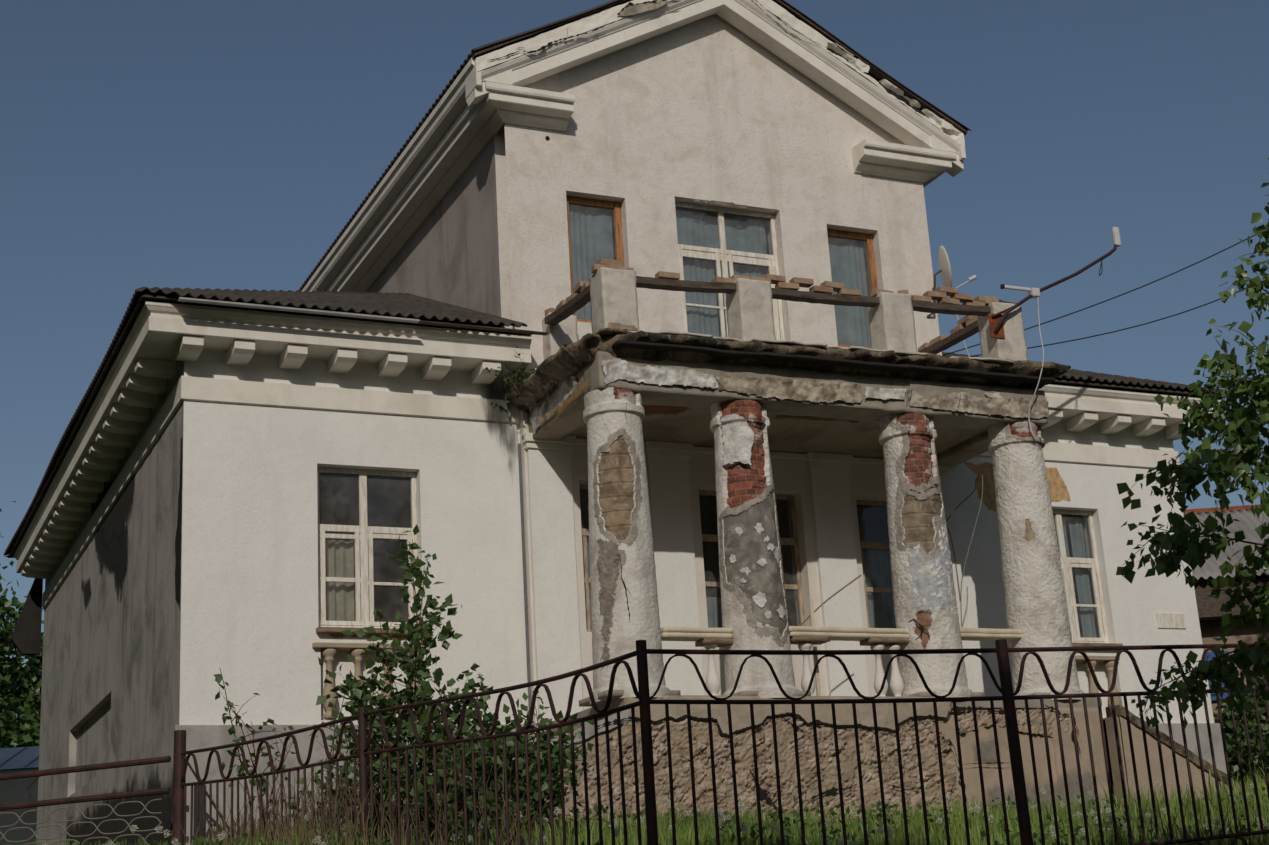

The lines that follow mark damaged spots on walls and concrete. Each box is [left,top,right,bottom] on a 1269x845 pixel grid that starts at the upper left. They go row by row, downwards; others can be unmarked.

flaking render [617,0,681,17]
peeling [835,42,870,73]
peeling [602,358,1049,649]
peeling [1046,467,1070,502]
flaking render [593,428,642,668]
crack [615,557,631,621]